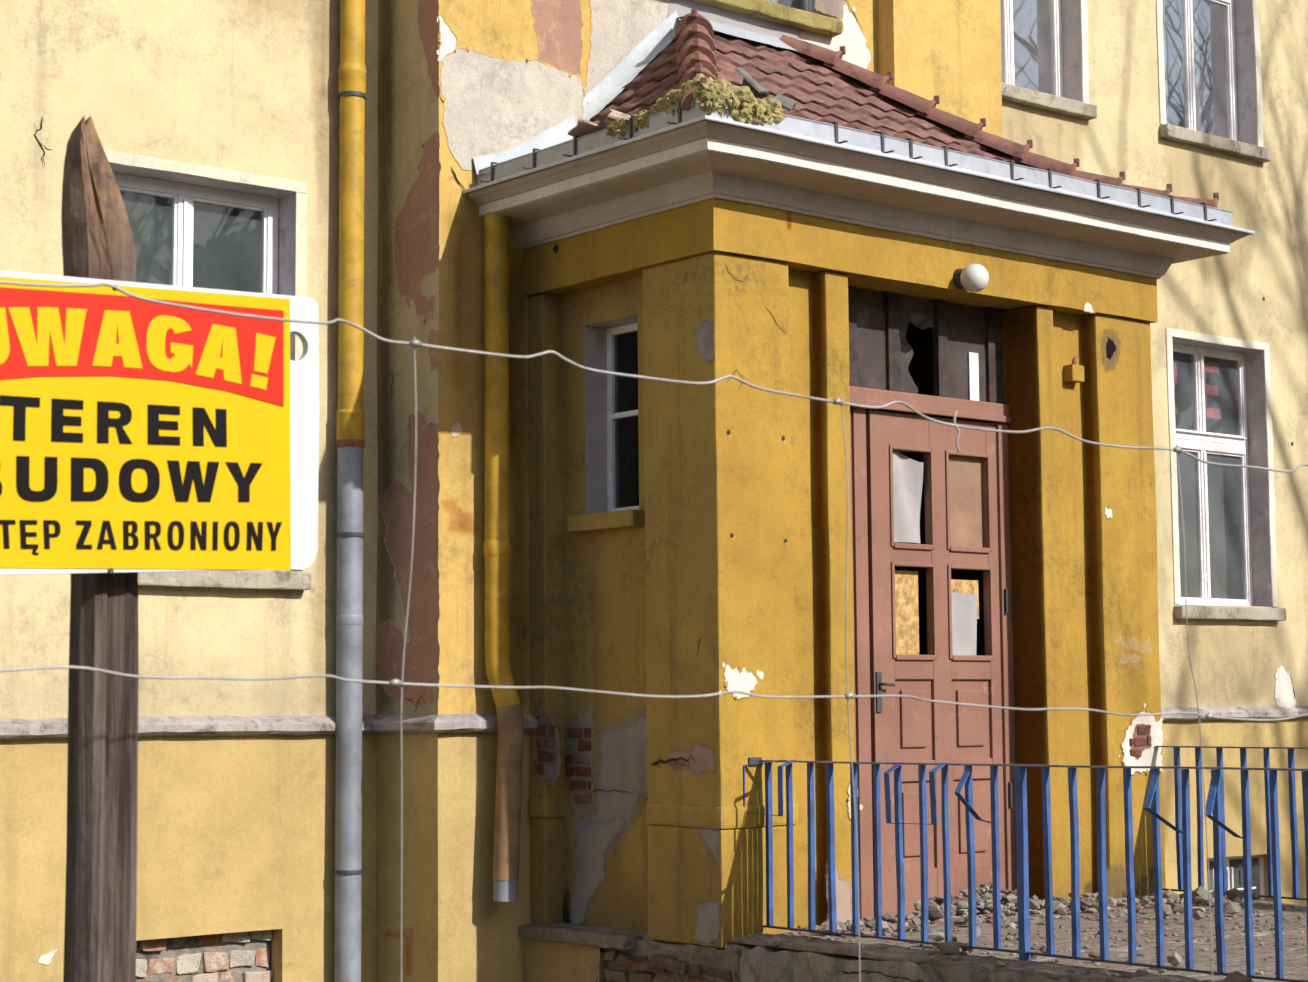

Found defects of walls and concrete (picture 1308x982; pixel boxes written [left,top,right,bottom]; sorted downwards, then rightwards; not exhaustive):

flaking render [797,0,872,69]
crack [34,116,55,163]
flaking render [392,0,670,371]
peeling [375,410,463,706]
flaking render [719,661,764,700]
flaking render [668,743,716,775]
flaking render [1119,703,1163,776]
flaking render [531,697,648,924]